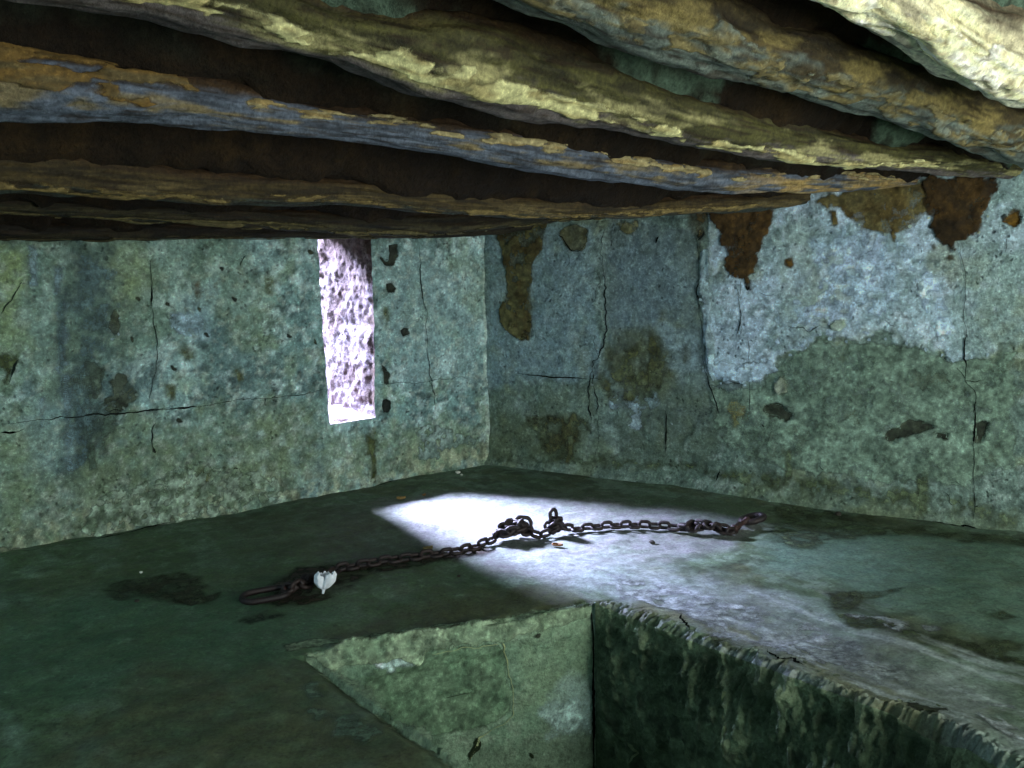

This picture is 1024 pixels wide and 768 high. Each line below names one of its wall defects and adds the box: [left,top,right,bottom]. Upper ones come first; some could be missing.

corrosion [496,224,547,340]
corrosion [709,209,773,291]
corrosion [922,175,999,260]
spalling [1001,209,1021,227]
crack [1,261,319,453]
crack [516,227,610,456]
damp [598,336,671,402]
peeling [698,249,1021,489]
crack [912,247,980,529]
damp [108,573,220,606]